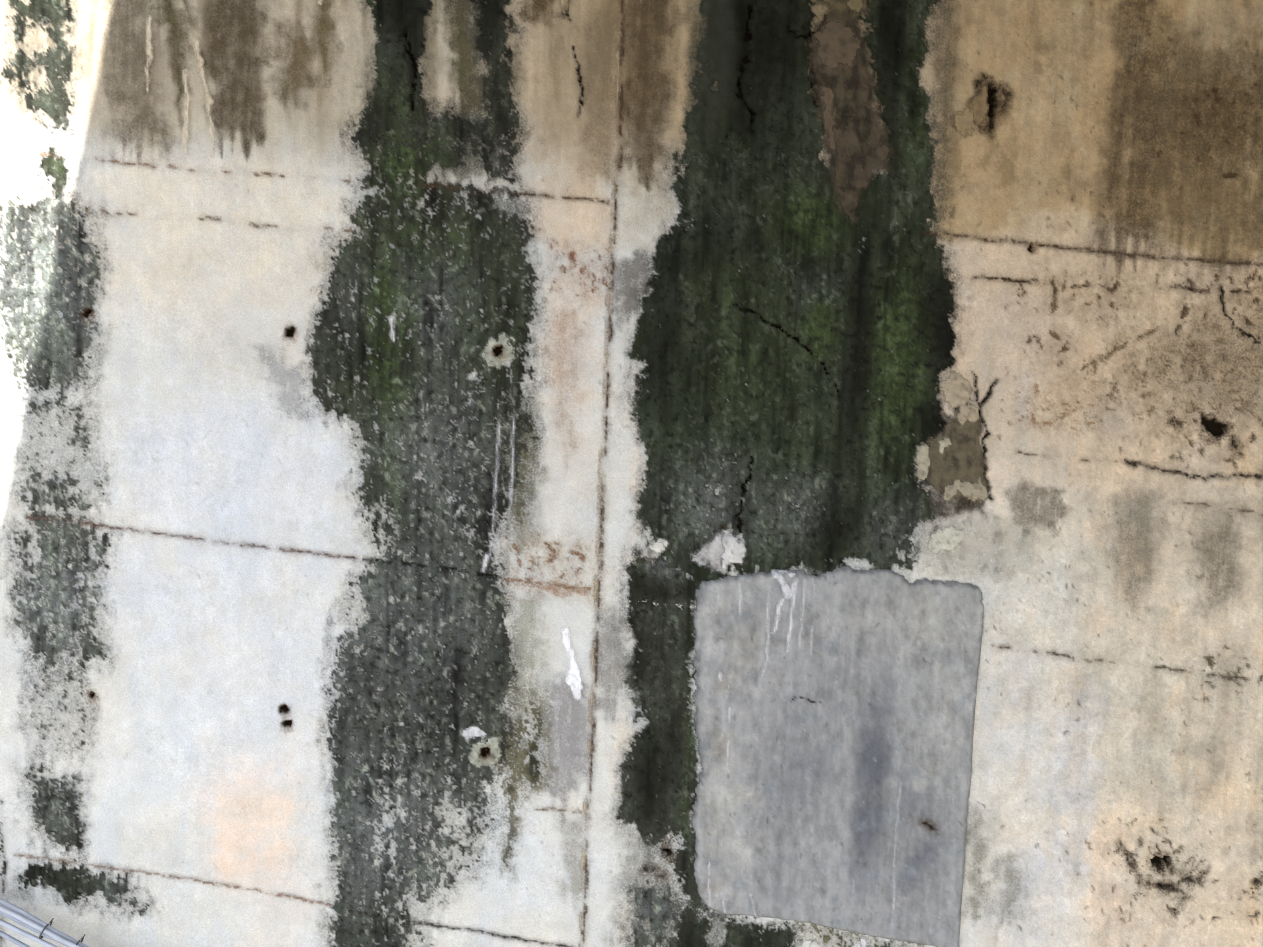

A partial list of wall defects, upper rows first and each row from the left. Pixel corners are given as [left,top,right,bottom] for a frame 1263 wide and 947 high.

water stain [1,0,82,135]
water stain [37,146,70,199]
water stain [353,0,548,179]
crack [736,6,755,122]
crack [787,15,827,107]
water stain [856,0,956,233]
flaking render [955,73,1012,137]
crack [1220,286,1260,343]
flaking render [914,371,990,505]
flaking render [927,521,1033,579]
water stain [21,665,96,853]
spalling [1108,819,1218,916]